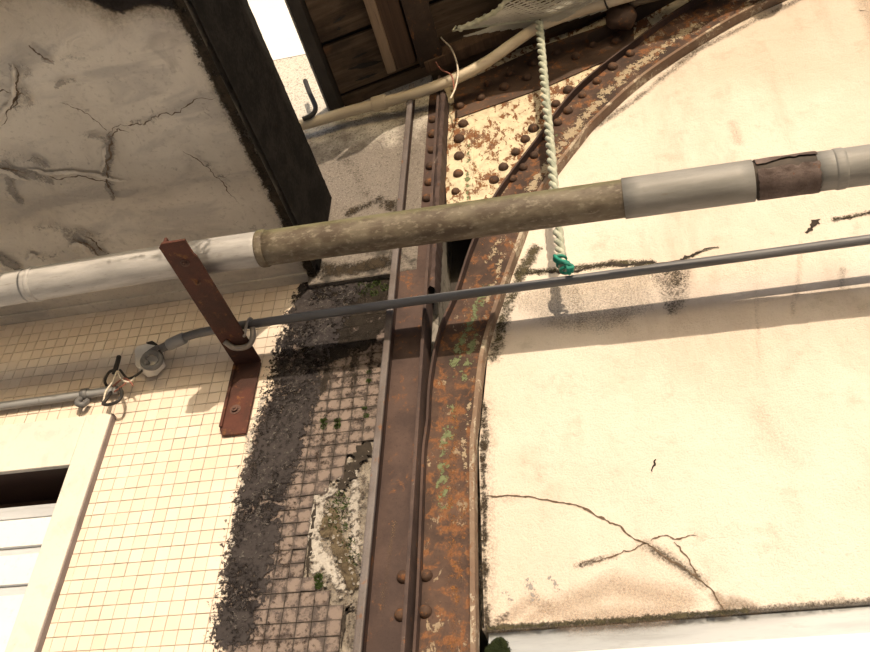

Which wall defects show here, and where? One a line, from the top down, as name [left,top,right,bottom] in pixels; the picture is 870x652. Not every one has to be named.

crack [0,45,72,124]
crack [0,98,215,204]
water stain [90,0,332,227]
crack [184,152,239,203]
water stain [345,196,397,217]
crack [805,210,870,233]
water stain [204,255,392,652]
spalling [303,441,374,652]
crack [485,495,723,609]